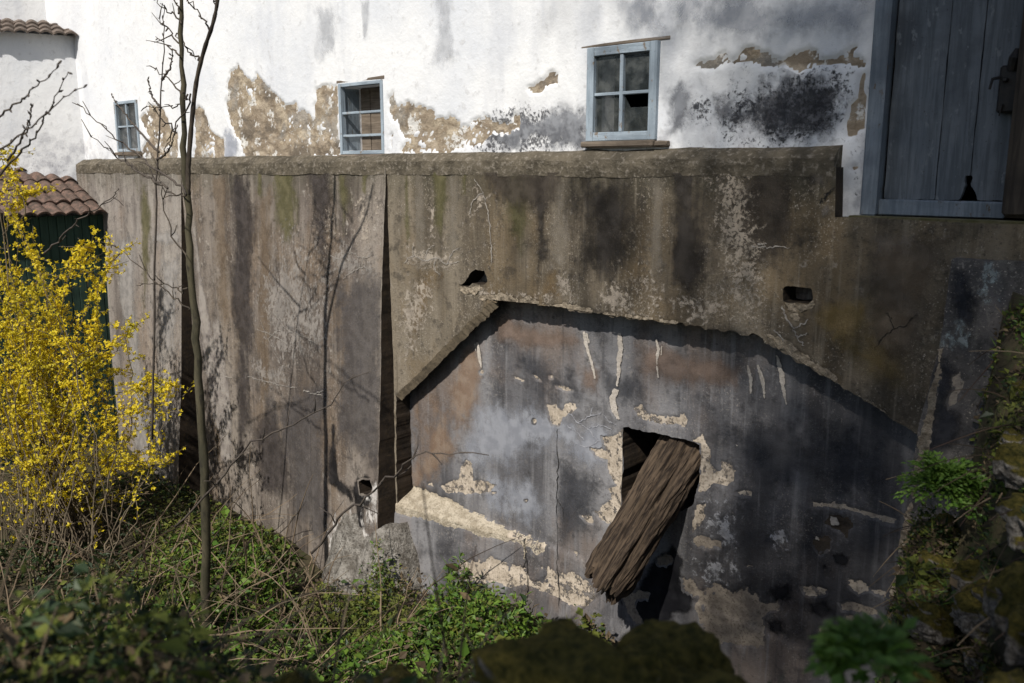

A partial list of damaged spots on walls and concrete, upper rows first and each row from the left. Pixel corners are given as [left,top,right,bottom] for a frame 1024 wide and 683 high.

peeling [194,65,340,158]
peeling [390,93,521,153]
leakage [471,104,586,152]
peeling [528,72,558,93]
leakage [669,66,853,148]
peeling [696,47,867,136]
leakage [193,173,380,552]
leakage [607,379,633,420]
peeling [395,460,596,606]
leakage [560,472,588,531]
peeling [582,429,623,524]
leakage [739,429,889,491]